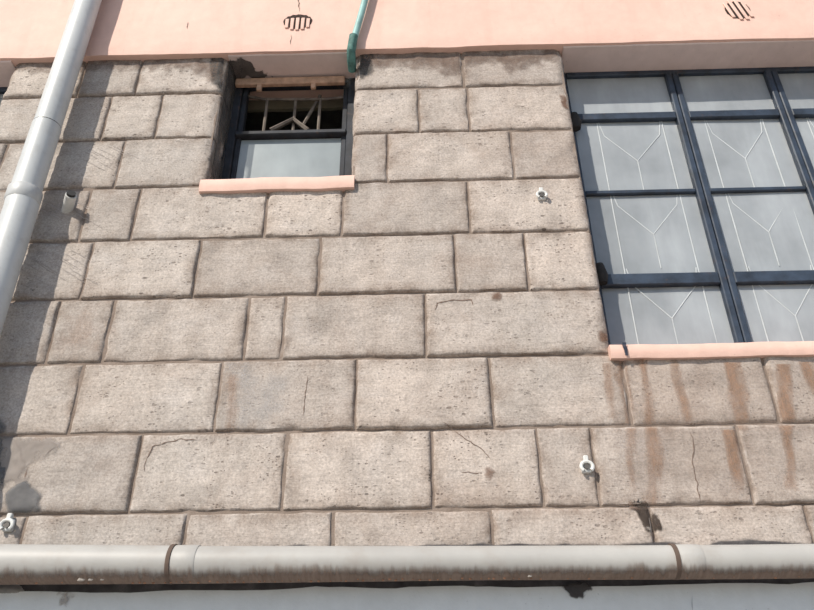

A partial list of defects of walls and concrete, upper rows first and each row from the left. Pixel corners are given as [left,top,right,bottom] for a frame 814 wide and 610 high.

corrosion [778,364,793,461]
crack [690,433,700,498]
corrosion [724,430,739,476]